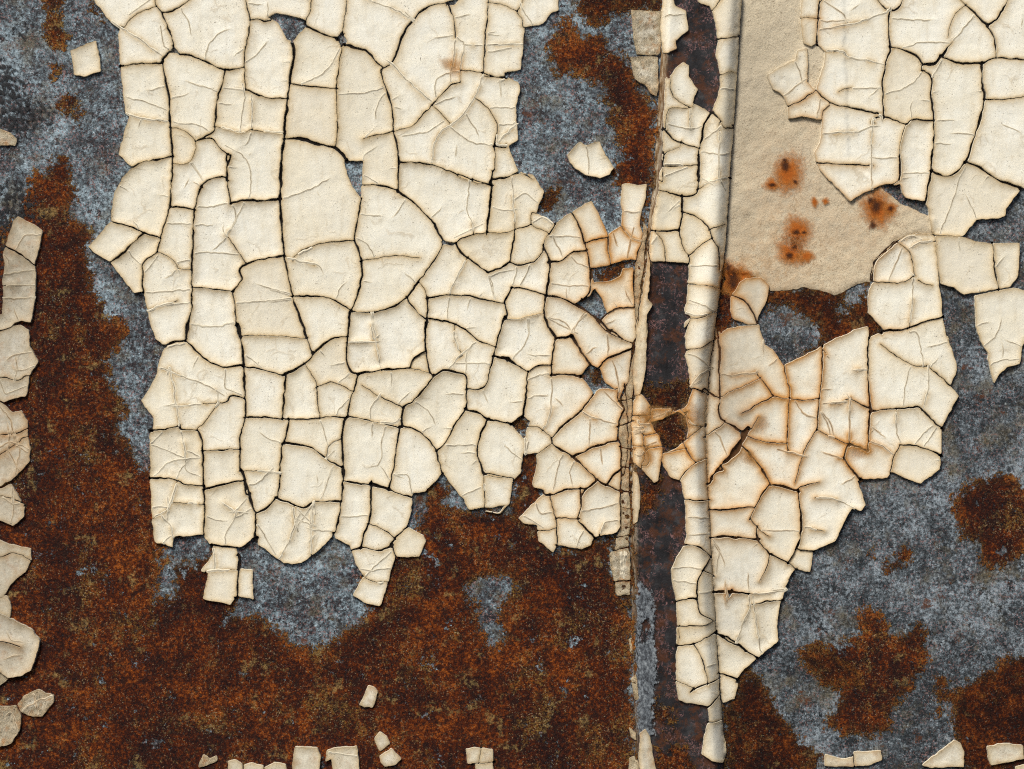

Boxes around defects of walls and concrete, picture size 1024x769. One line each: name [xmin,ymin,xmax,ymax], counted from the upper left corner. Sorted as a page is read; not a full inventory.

crack [817,0,1024,203]
peeling [0,217,43,526]
corrosion [0,0,696,769]
peeling [88,0,652,606]
crack [111,0,950,724]
peeling [618,0,1024,769]
crack [991,242,1000,291]
peeling [0,540,41,685]
peeling [199,746,360,769]
corrosion [721,666,824,769]
corrosion [793,604,1024,769]
corrosion [948,469,1024,577]